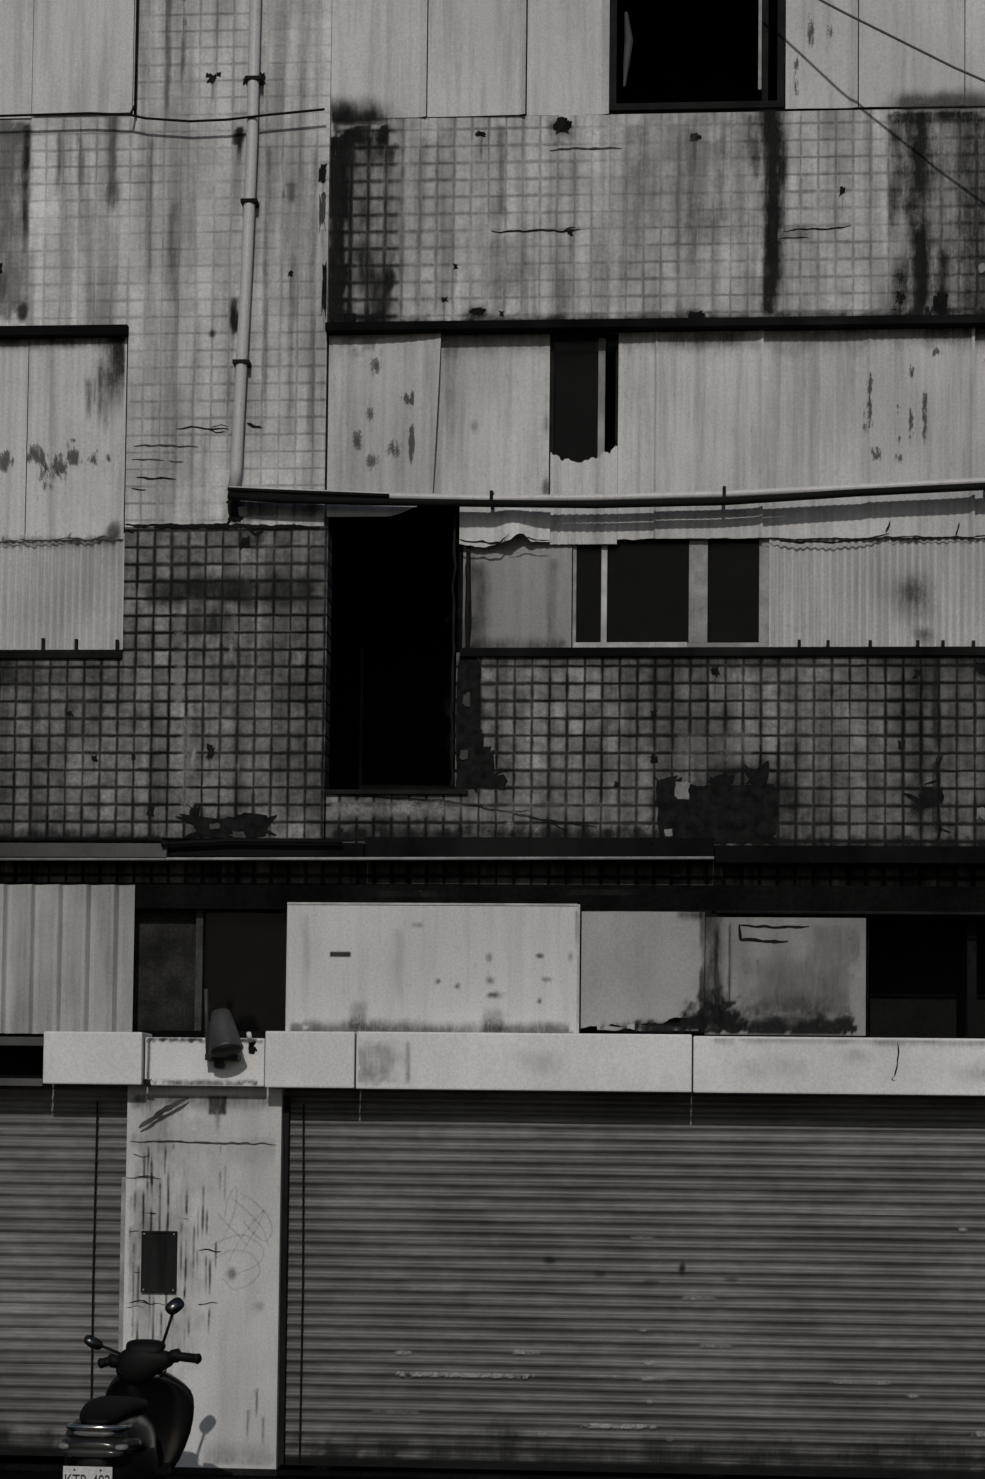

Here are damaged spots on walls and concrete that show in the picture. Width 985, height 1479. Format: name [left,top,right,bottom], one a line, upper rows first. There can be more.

damp [328,111,429,322]
damp [751,110,800,317]
damp [821,92,985,335]
corrosion [0,439,111,489]
corrosion [353,407,415,466]
spalling [454,656,508,793]
spalling [175,803,277,839]
spalling [650,753,778,845]
damp [623,911,857,1034]